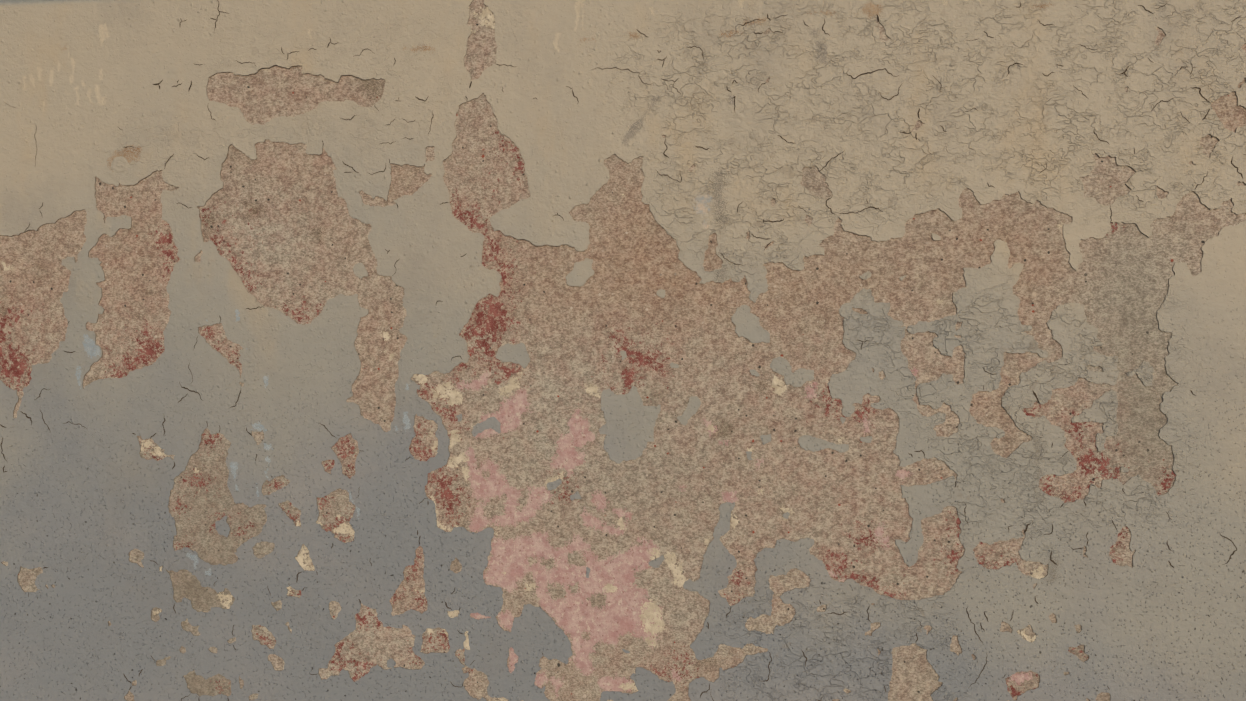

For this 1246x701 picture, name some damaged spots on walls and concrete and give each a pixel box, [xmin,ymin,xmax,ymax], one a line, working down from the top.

peeling [207,65,385,125]
peeling [464,0,497,81]
crack [737,14,830,36]
crack [848,68,978,140]
crack [1006,44,1093,98]
crack [1121,58,1210,122]
crack [718,151,881,265]
peeling [0,170,180,418]
peeling [184,93,1246,701]
peeling [137,428,301,565]